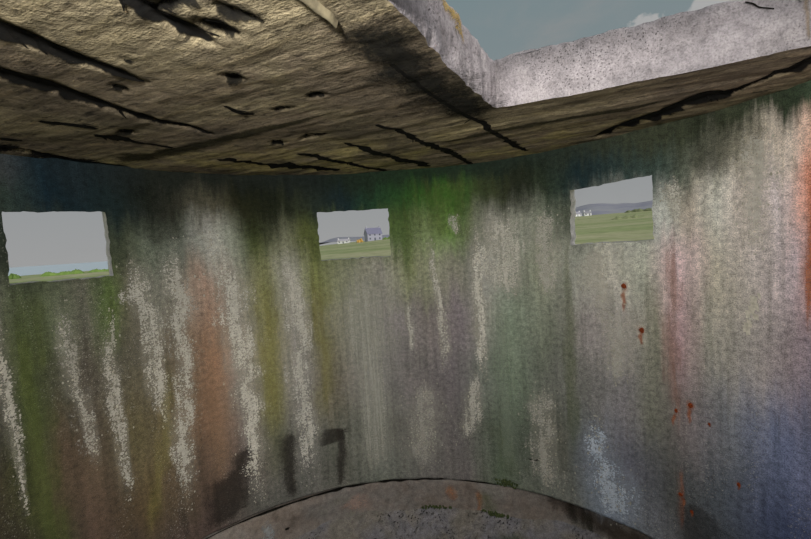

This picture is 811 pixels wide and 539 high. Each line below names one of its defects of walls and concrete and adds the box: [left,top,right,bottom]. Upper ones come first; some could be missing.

crack [0,21,144,82]
crack [0,67,213,149]
crack [119,0,219,41]
crack [217,124,473,171]
leakage [338,13,505,119]
crack [595,57,811,136]
leakage [401,208,563,470]
efflorescence [0,321,30,516]